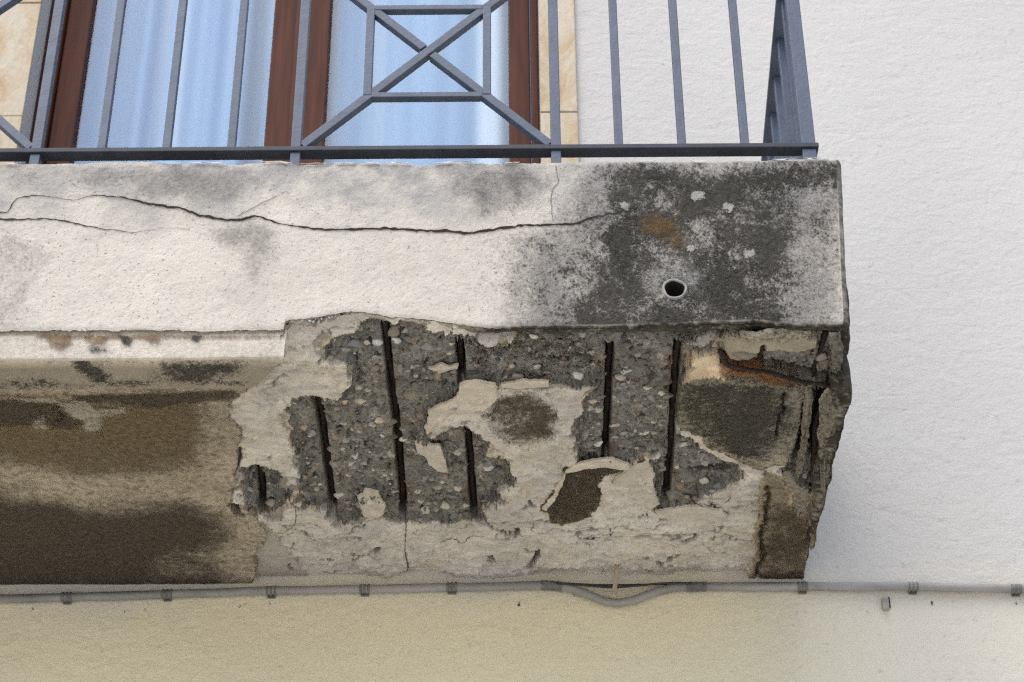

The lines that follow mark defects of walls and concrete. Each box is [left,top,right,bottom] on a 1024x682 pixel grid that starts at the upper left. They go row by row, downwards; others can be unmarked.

crack [0,166,631,235]
leakage [463,161,838,368]
leakage [0,333,275,475]
leakage [484,390,558,443]
peeling [229,313,844,579]
mould [679,381,798,461]
corrosion [719,351,795,387]
leakage [546,466,617,524]
leakage [0,496,231,585]